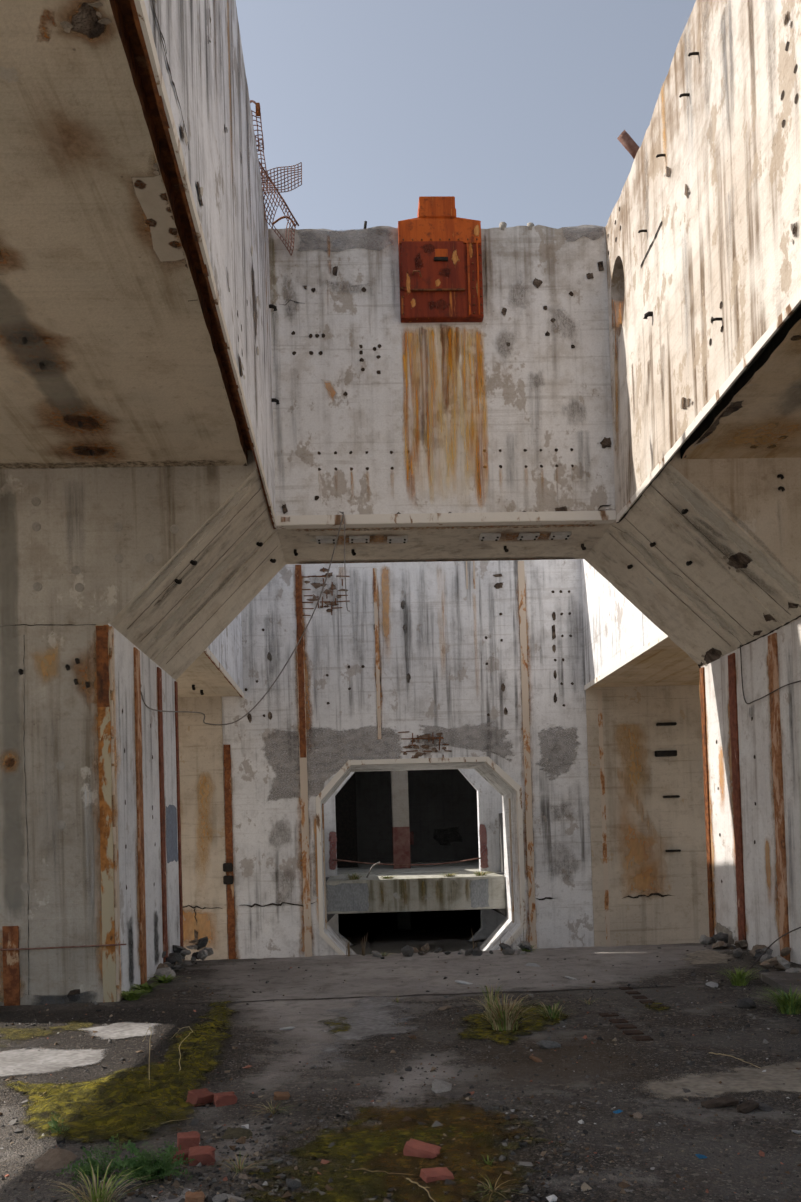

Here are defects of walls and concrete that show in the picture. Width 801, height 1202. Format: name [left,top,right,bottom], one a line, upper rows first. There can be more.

rust [403,327,488,499]